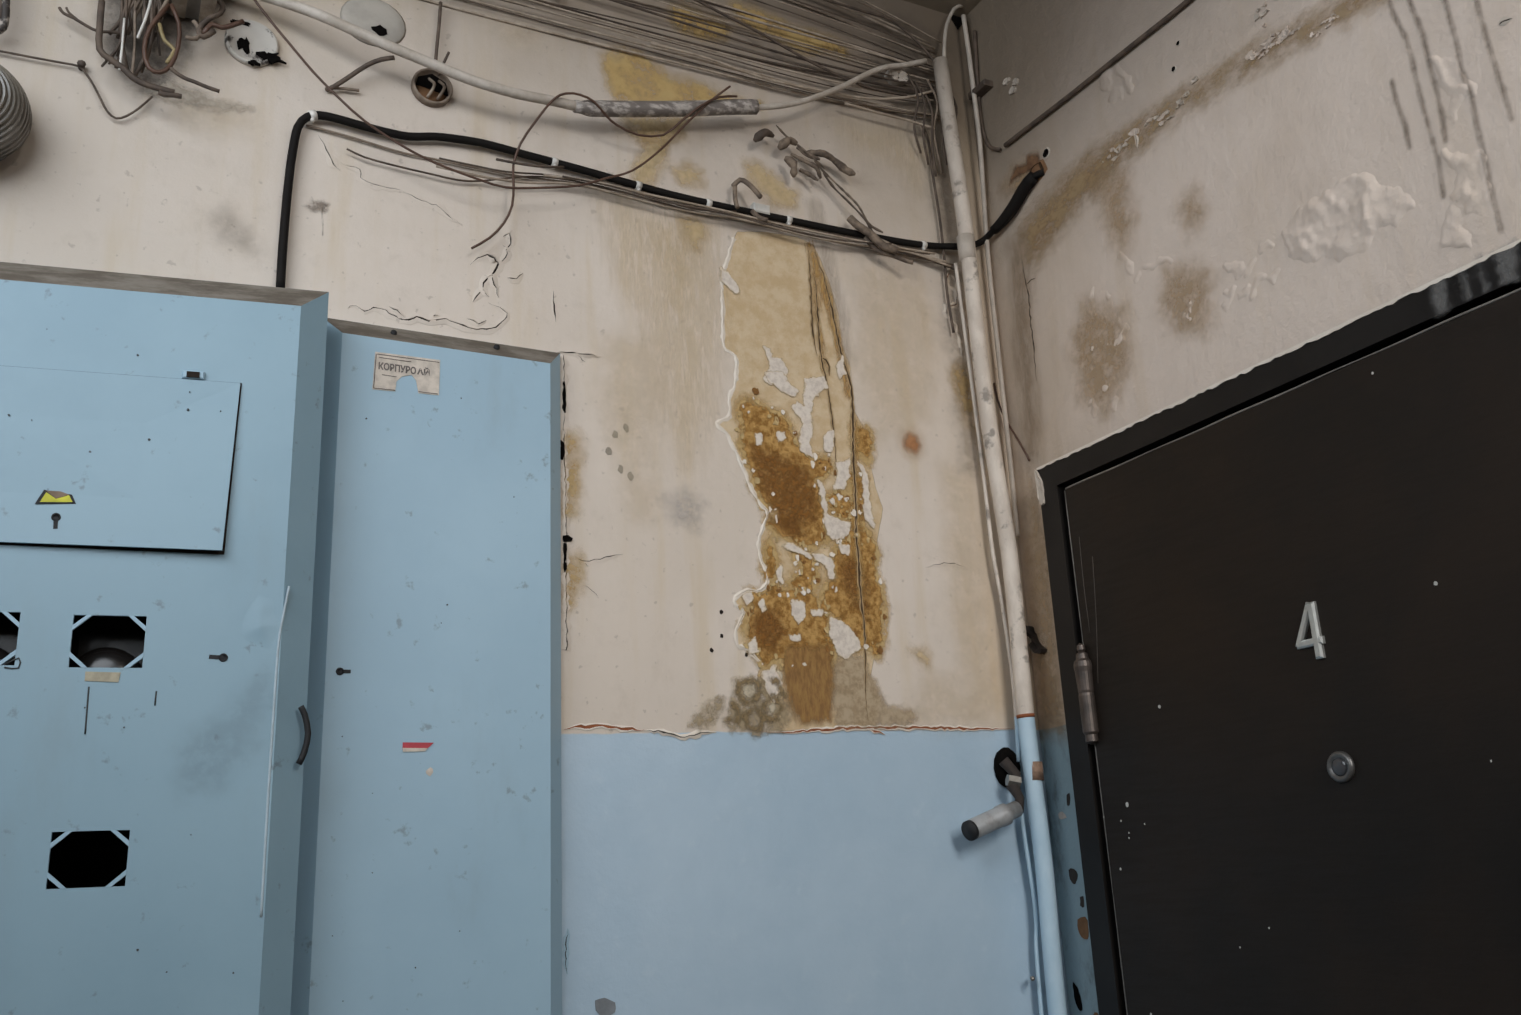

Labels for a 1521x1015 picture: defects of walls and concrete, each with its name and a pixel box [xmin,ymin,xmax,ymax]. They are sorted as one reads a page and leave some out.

water stain [604,51,729,101]
water stain [1394,0,1446,143]
water stain [633,119,697,183]
water stain [1025,0,1367,260]
crack [317,135,601,362]
water stain [1079,313,1123,397]
peeling [715,232,888,731]
rust [904,434,919,452]
mould [691,671,790,736]
water stain [833,656,915,728]